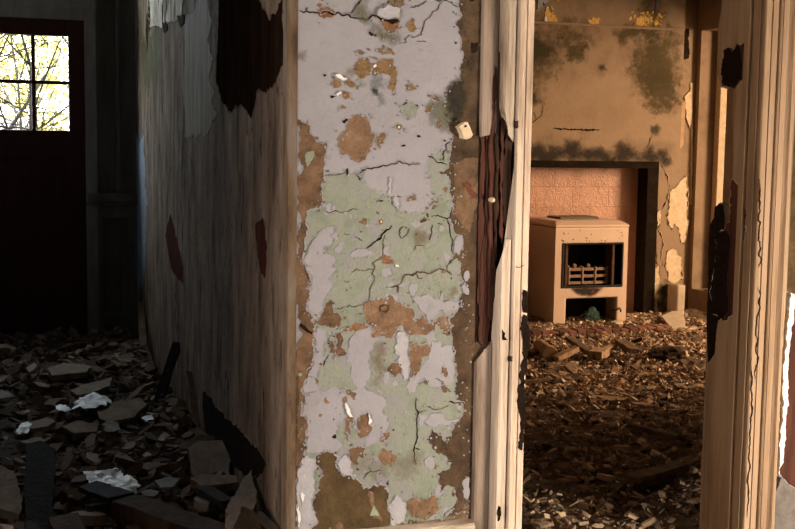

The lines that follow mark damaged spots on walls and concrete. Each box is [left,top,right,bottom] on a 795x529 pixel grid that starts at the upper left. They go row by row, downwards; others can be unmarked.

peeling [146,0,283,139]
crack [299,0,385,20]
crack [399,0,458,44]
mould [532,20,587,104]
peeling [629,11,665,27]
mould [618,0,680,108]
crack [326,142,449,180]
spalling [498,137,515,186]
crack [341,207,460,309]
peeling [295,0,506,529]
peeling [654,162,689,312]
crack [413,378,466,464]